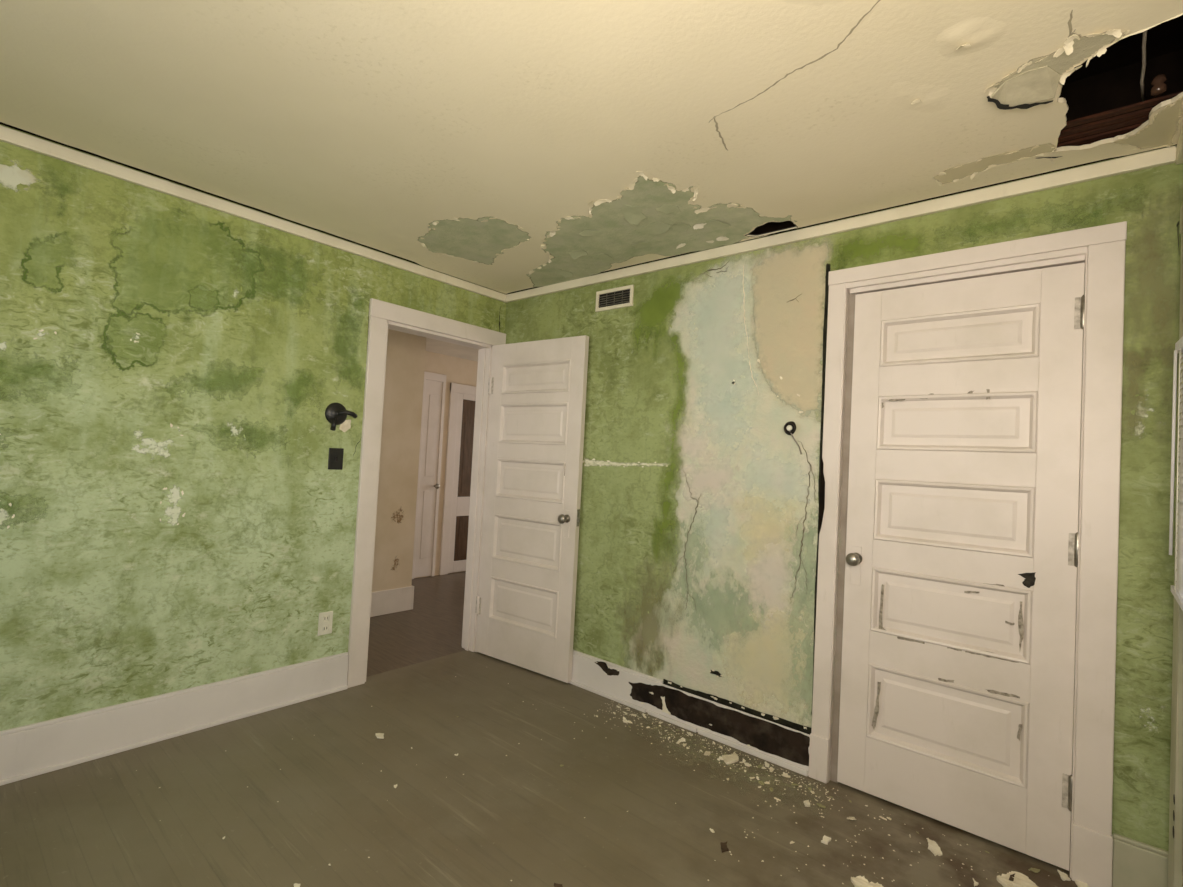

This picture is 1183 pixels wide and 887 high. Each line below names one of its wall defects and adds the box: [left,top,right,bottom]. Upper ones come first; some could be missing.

crack [709,0,880,150]
leakage [20,233,64,293]
leakage [101,222,307,371]
spalling [0,122,419,265]
peeling [129,423,183,460]
peeling [160,486,185,525]
flaking render [339,420,351,432]
crack [673,465,701,611]
peeling [418,13,1183,801]
crack [790,441,816,603]